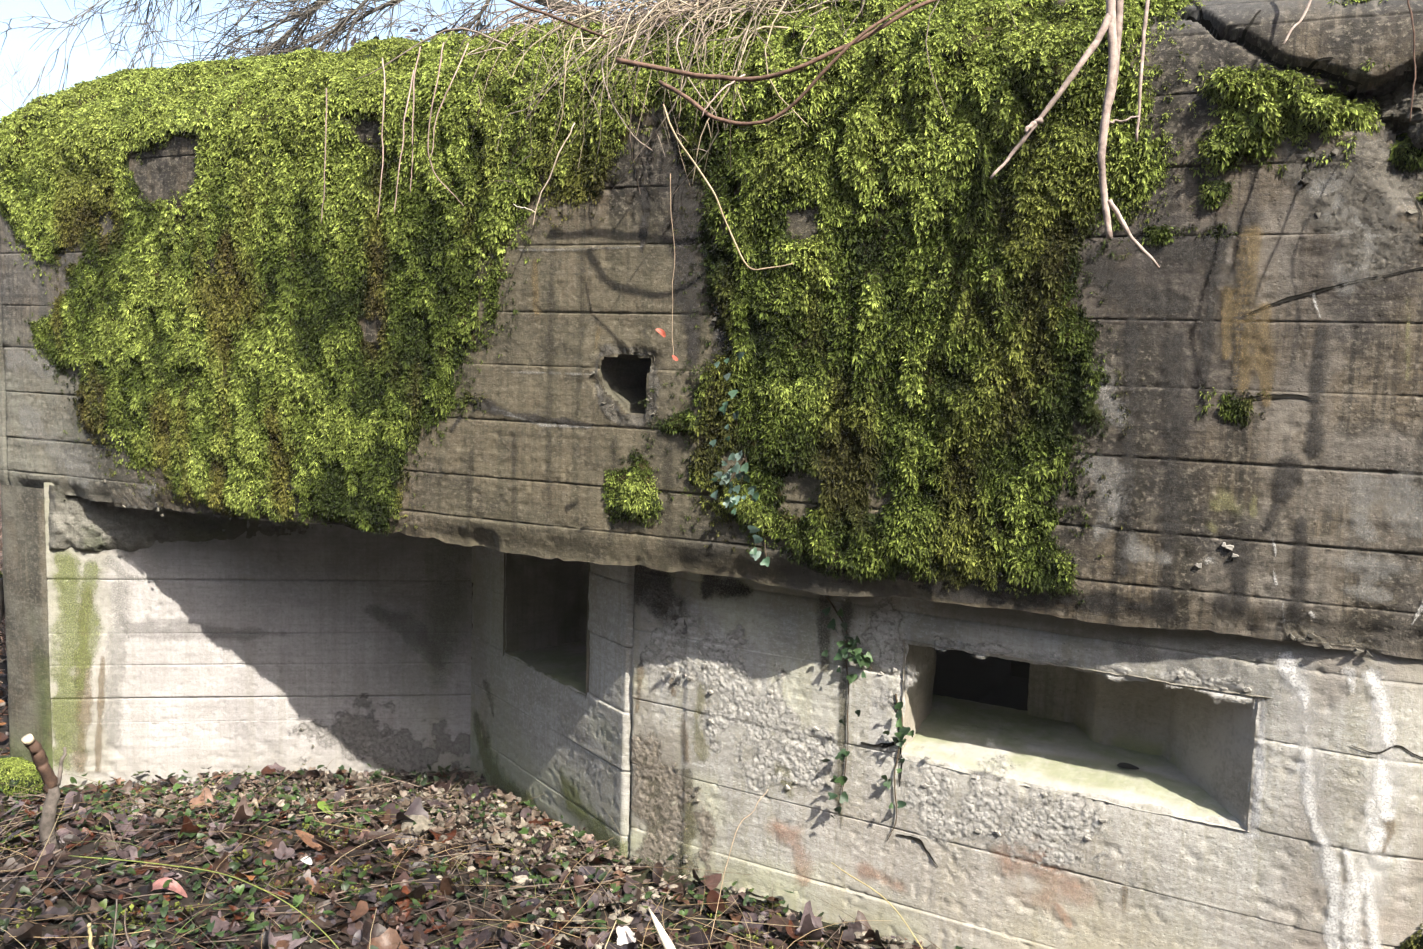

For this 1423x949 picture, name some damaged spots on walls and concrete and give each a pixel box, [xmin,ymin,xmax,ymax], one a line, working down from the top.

crack [1242,189,1423,316]
spalling [43,479,313,552]
spalling [591,344,660,427]
damp [889,218,1257,621]
damp [1250,293,1328,629]
damp [74,562,101,689]
damp [560,757,699,875]
spalling [641,597,840,792]
damp [1277,651,1400,949]
crack [1351,745,1423,758]